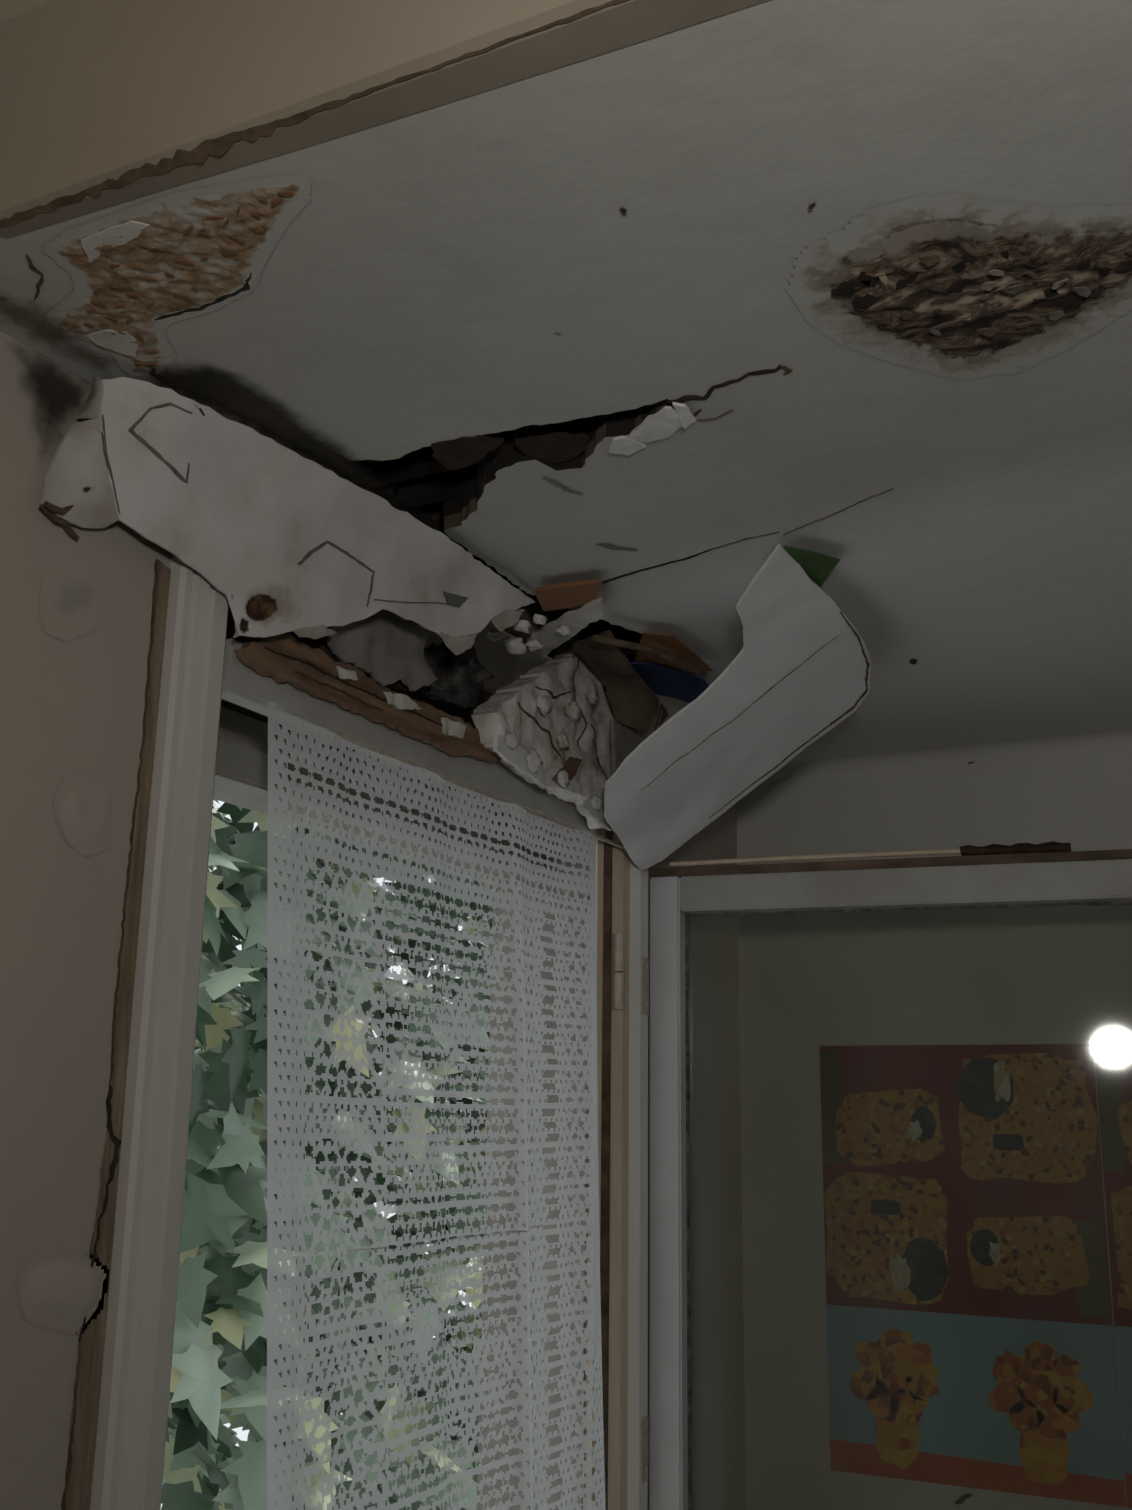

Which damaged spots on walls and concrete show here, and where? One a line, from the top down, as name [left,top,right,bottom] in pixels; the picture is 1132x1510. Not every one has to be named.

peeling [41,174,313,379]
spalling [785,192,1132,382]
crack [667,364,793,422]
peeling [431,432,590,471]
peeling [609,402,696,456]
peeling [293,624,336,639]
peeling [440,632,477,655]
peeling [493,734,559,787]
peeling [579,784,613,831]